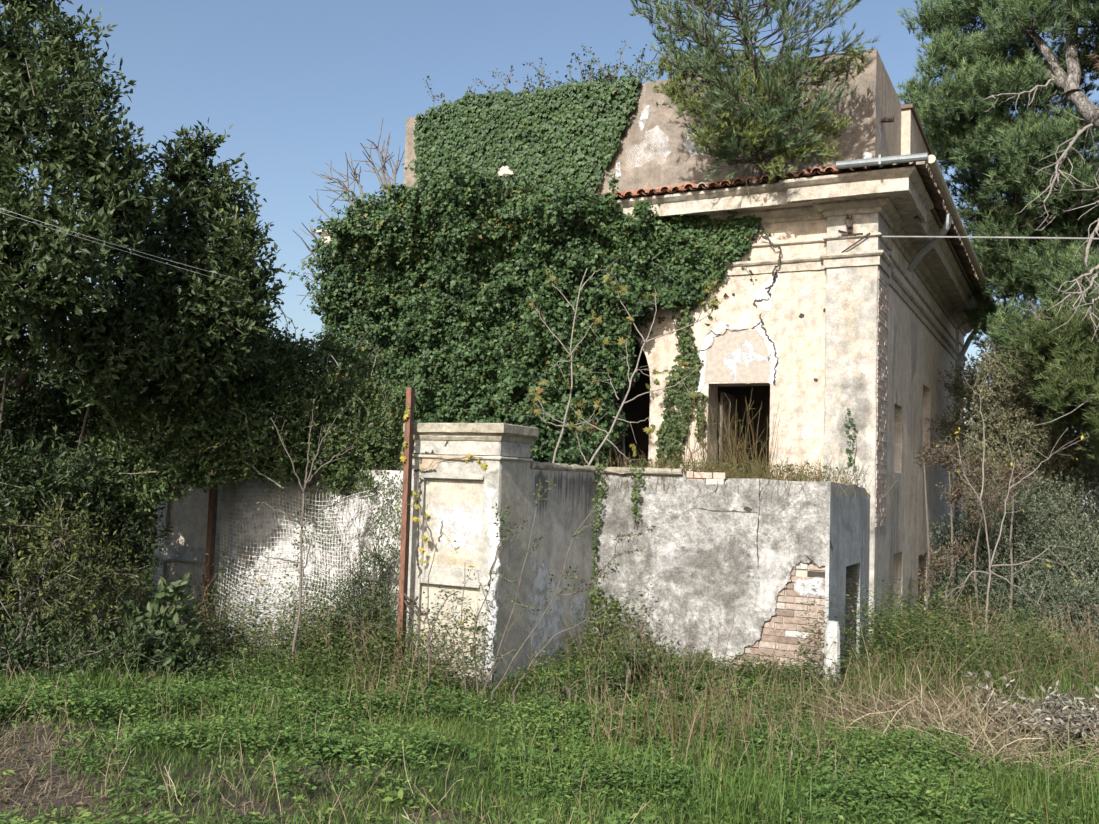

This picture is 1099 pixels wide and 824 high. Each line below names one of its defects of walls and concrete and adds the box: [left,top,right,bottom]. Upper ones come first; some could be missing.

peeling [636,105,670,166]
peeling [684,124,707,156]
peeling [691,272,781,393]
crack [698,235,782,386]
spalling [730,548,825,683]